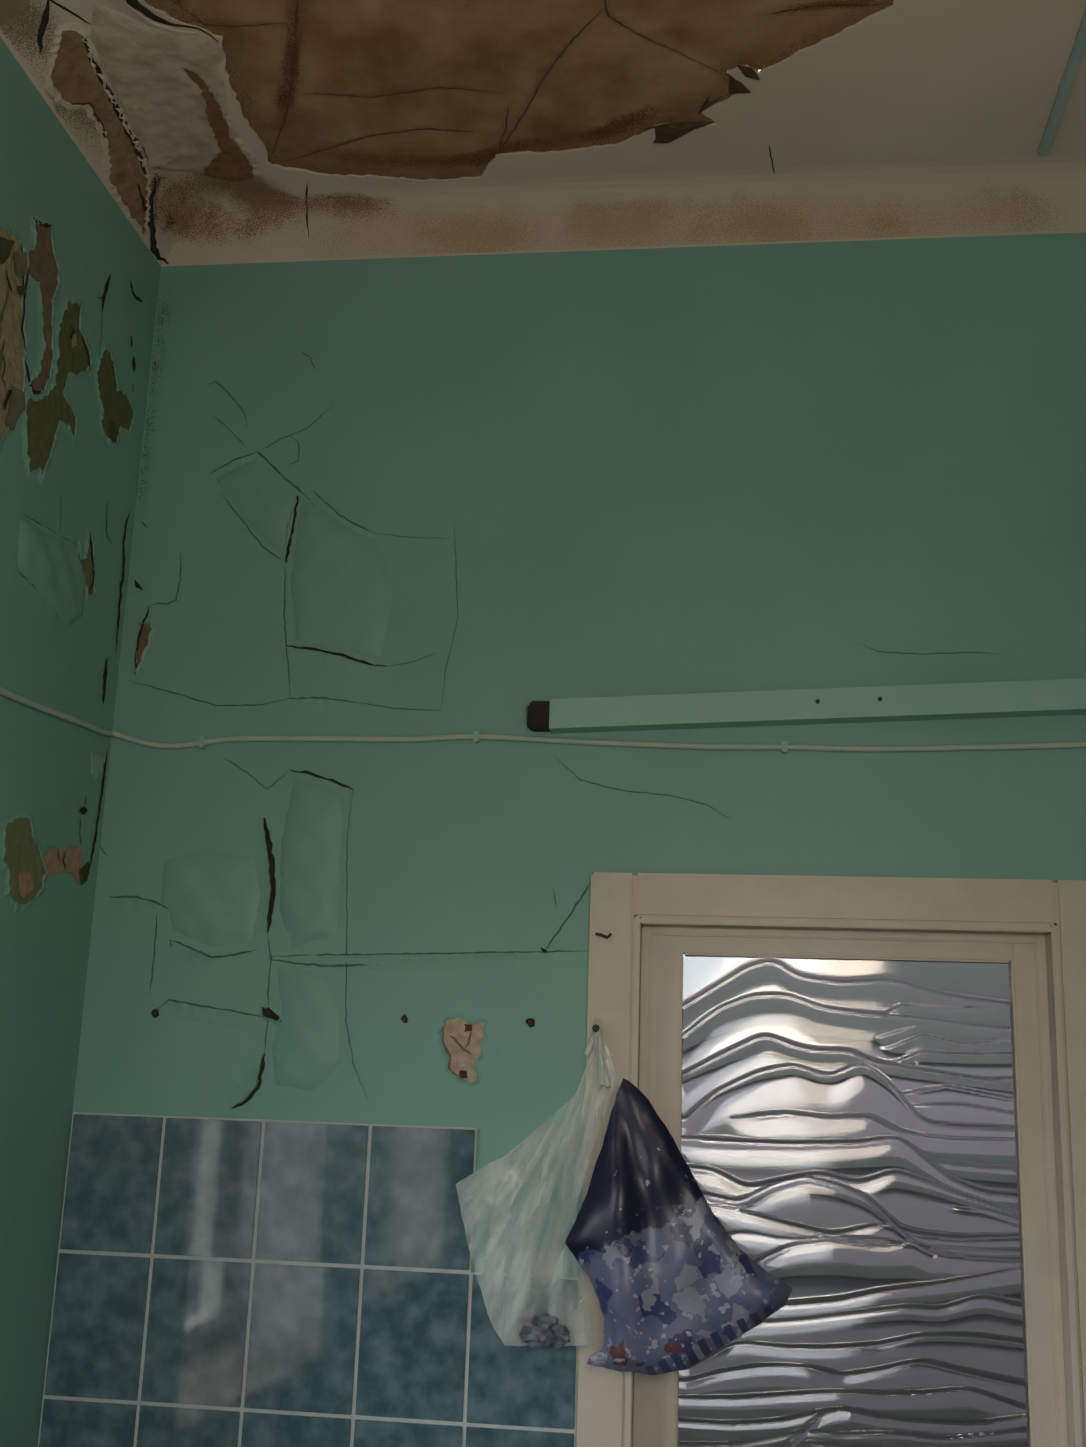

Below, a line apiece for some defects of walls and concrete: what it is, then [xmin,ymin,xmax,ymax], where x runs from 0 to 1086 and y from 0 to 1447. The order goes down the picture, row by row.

leakage [0,0,105,163]
flaking render [42,22,155,239]
flaking render [183,68,260,181]
crack [37,0,723,237]
leakage [75,0,1086,258]
peeling [644,65,760,144]
crack [765,4,883,15]
peeling [0,212,136,486]
peeling [0,799,89,915]
flaking render [436,1012,490,1088]